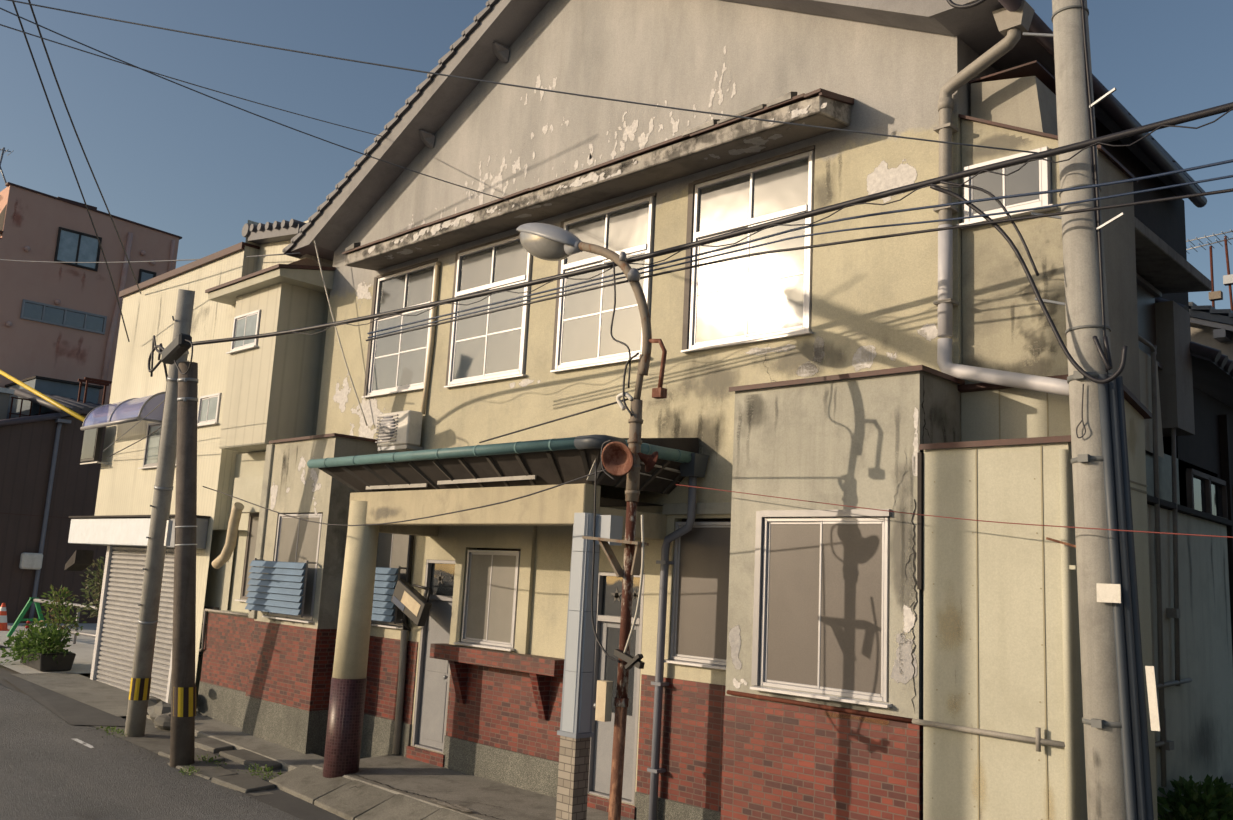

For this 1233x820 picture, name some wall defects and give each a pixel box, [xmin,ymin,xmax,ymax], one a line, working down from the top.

peeling [392,45,736,244]
peeling [866,159,917,203]
peeling [333,374,385,439]
leakage [673,426,718,453]
peeling [270,456,321,516]
crack [894,375,930,707]